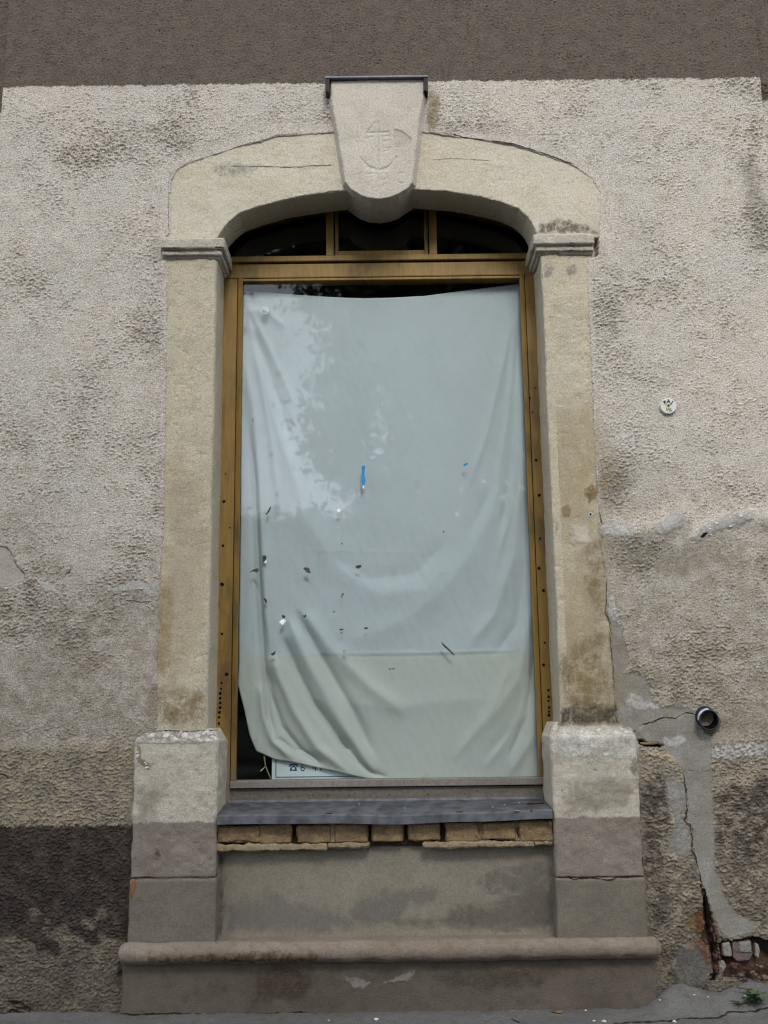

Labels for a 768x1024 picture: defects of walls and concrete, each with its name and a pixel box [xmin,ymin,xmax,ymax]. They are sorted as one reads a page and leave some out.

crack [168,133,325,234]
damp [559,617,616,724]
crack [634,712,695,732]
crack [674,770,702,883]
spalling [701,888,768,982]